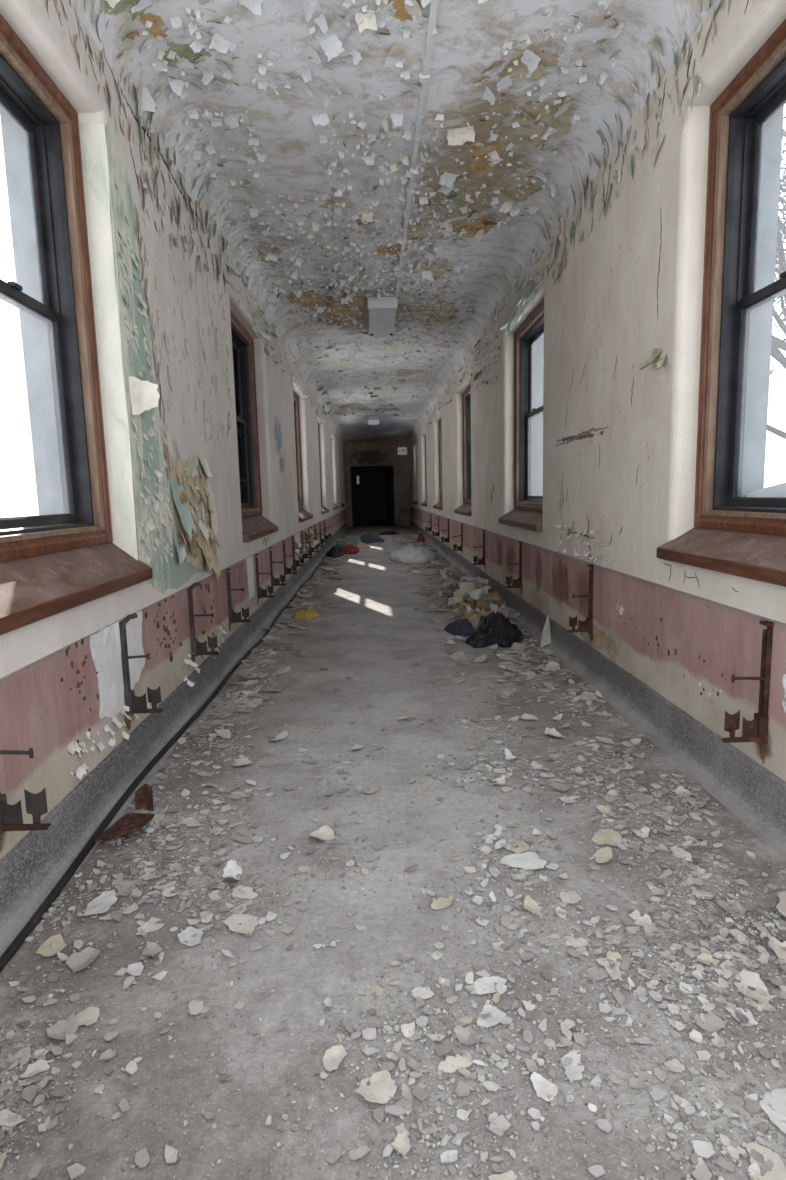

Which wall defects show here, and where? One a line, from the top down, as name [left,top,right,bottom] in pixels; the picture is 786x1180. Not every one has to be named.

peeling [34,0,729,687]